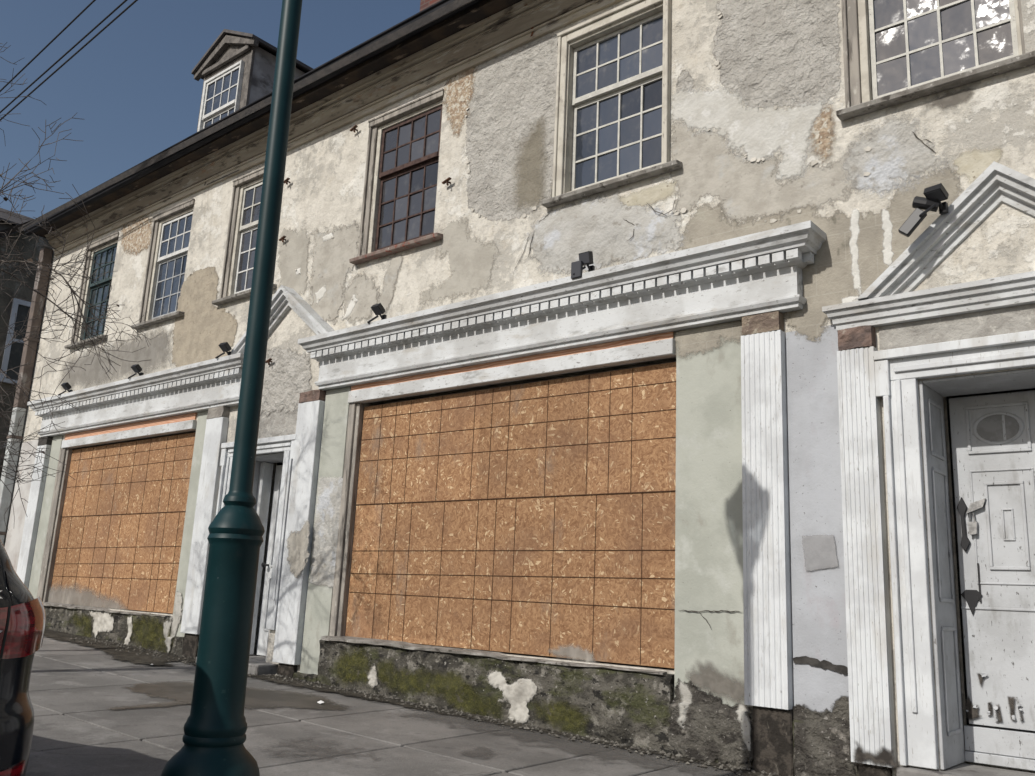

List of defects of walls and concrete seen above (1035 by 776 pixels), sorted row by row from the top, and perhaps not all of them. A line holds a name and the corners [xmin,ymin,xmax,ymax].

flaking render [419,32,558,308]
flaking render [121,216,152,255]
leakage [842,209,861,303]
leakage [881,209,894,266]
flaking render [156,266,237,367]
crack [679,610,740,630]
flaking render [667,679,753,764]